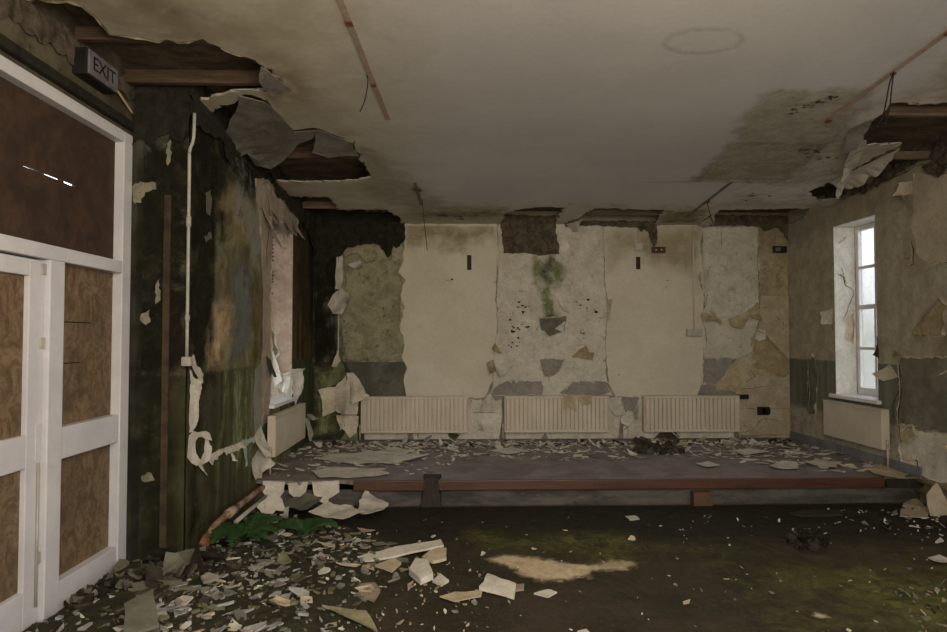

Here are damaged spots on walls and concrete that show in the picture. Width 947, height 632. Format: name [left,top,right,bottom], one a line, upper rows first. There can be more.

spalling [0,0,90,66]
leakage [699,90,863,181]
peeling [106,61,406,396]
spalling [500,214,658,258]
leakage [130,125,259,551]
peeling [486,301,594,398]
flaking render [252,329,878,480]
peeling [700,302,790,378]
peeling [820,308,856,343]
peeling [872,339,947,449]